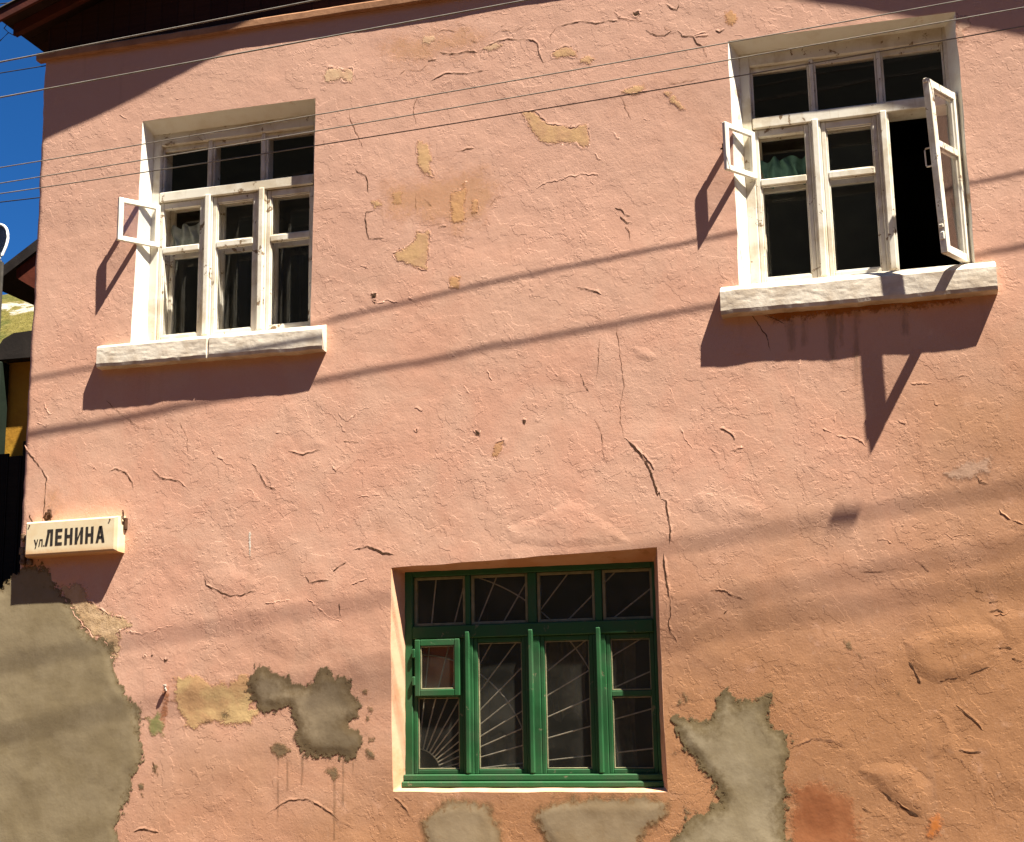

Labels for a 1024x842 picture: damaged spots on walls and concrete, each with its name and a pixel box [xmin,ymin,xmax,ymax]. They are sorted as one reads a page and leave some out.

peeling [321,65,354,84]
peeling [415,140,436,178]
peeling [521,109,601,161]
peeling [392,228,432,271]
crack [25,446,49,521]
crack [578,286,678,644]
peeling [59,583,134,662]
peeling [174,674,259,730]